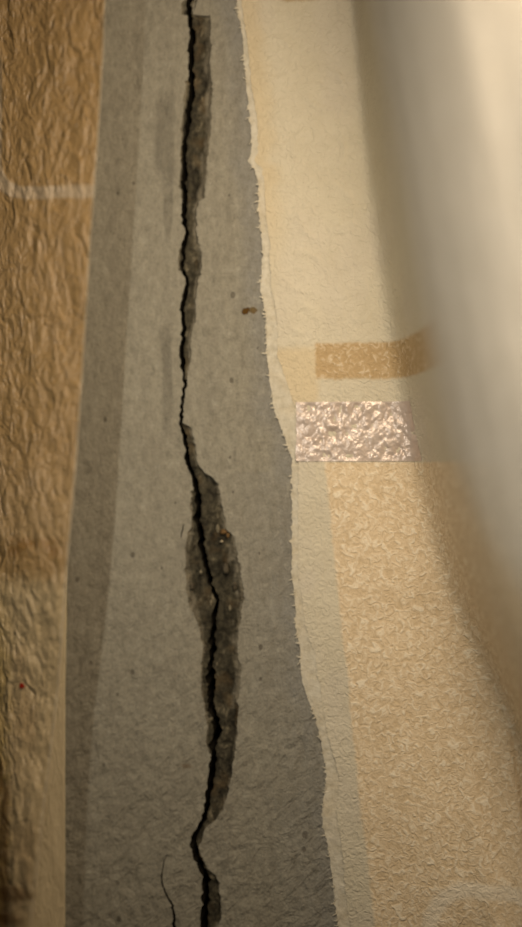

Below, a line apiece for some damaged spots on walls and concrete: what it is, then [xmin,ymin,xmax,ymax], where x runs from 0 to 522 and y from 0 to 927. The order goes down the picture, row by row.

flaking render [178,0,213,380]
crack [161,854,176,927]
crack [179,0,223,927]
flaking render [181,424,245,927]